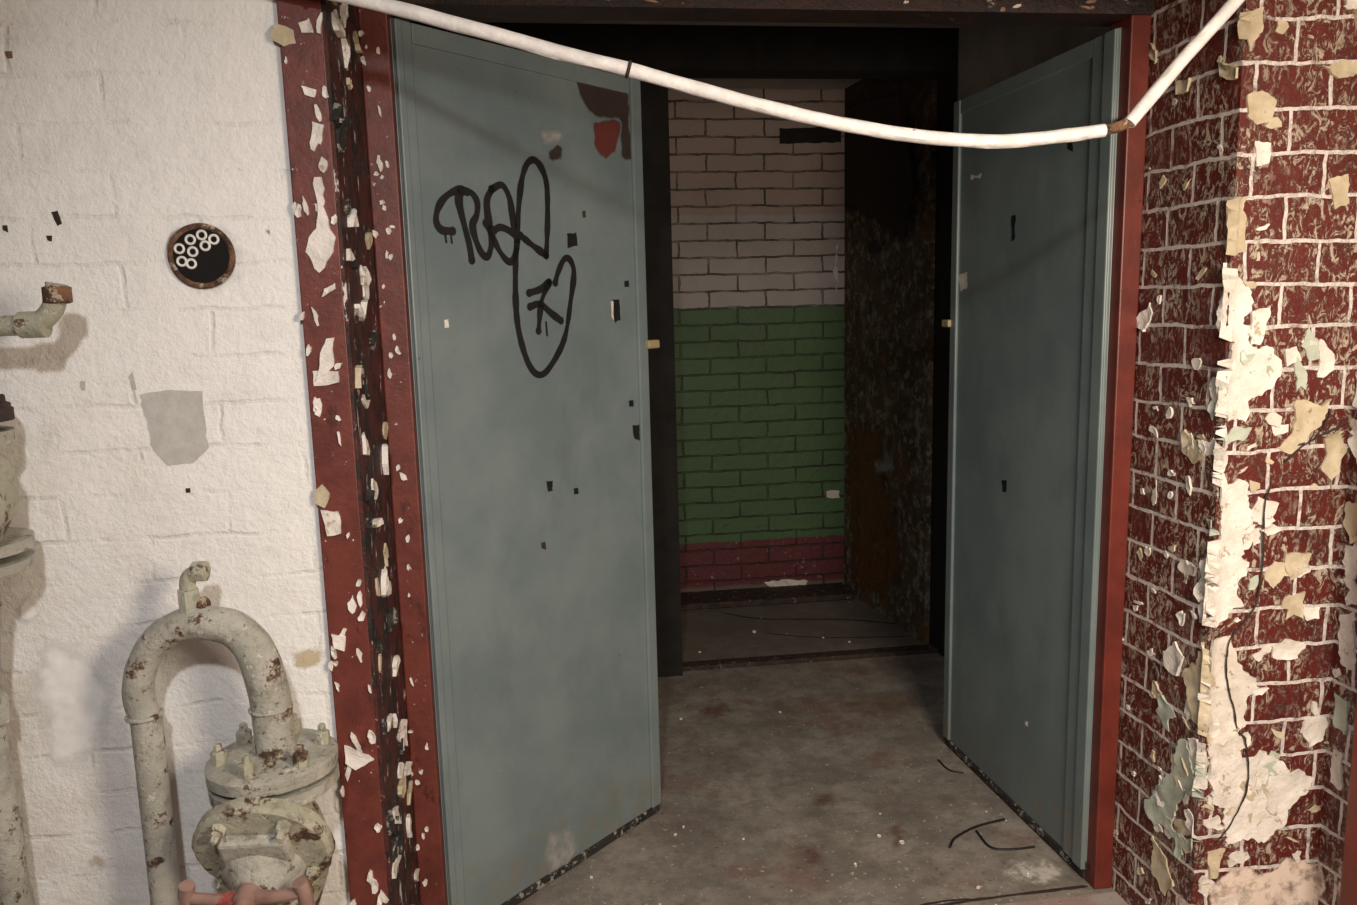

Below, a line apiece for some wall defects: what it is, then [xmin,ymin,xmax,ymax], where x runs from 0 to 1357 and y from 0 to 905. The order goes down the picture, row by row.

peeling [270,1,381,116]
peeling [1217,56,1238,80]
peeling [1237,7,1289,52]
peeling [1322,60,1357,79]
peeling [1343,0,1357,29]
peeling [1246,90,1282,167]
peeling [1328,174,1357,209]
peeling [292,86,401,446]
peeling [314,485,350,539]
peeling [362,422,410,543]
peeling [295,543,414,694]
peeling [340,713,429,905]